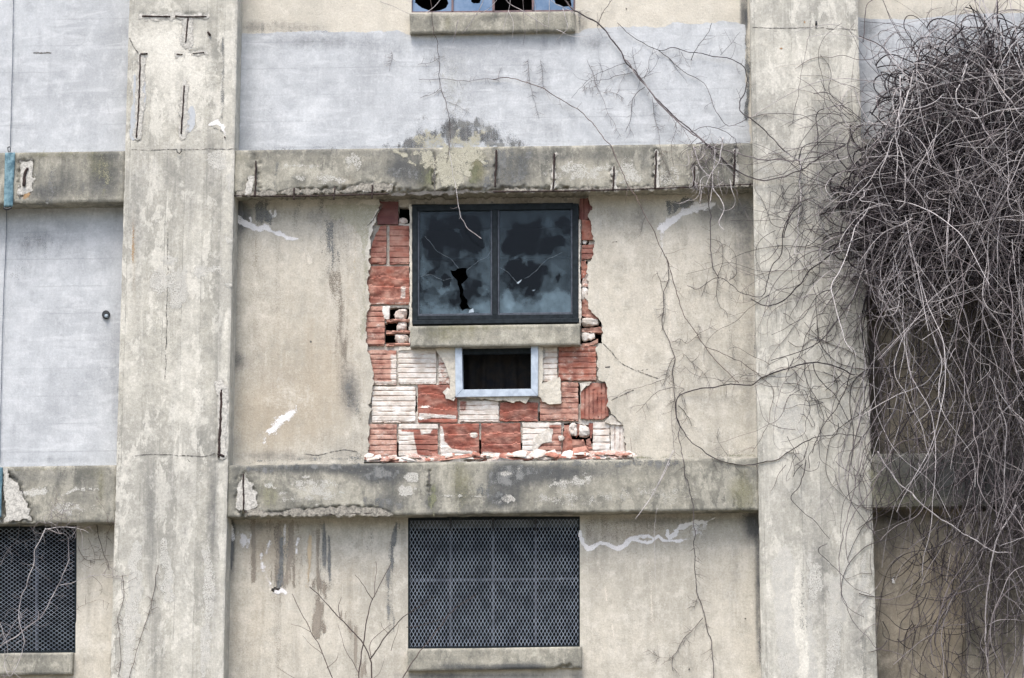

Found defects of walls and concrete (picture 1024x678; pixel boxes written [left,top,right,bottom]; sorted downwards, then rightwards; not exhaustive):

leakage [360,56,533,190]
spalling [17,159,36,199]
spalling [205,144,762,326]
flaking render [398,346,562,405]
leakage [246,200,407,633]
spalling [3,467,98,522]
crack [135,453,218,462]
spalling [236,474,393,518]
peeling [399,472,425,497]
peeling [561,446,589,458]
leakage [476,456,682,509]
leakage [231,519,367,678]